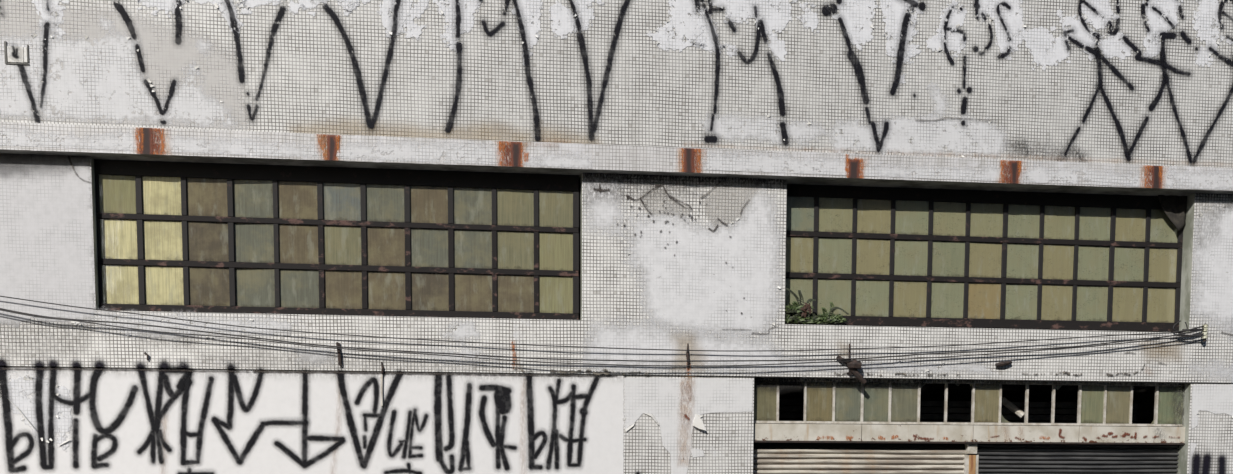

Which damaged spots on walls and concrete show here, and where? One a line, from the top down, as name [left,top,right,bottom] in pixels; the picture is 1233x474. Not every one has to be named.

peeling [645,0,1233,84]
corrosion [135,127,165,155]
corrosion [317,134,340,161]
corrosion [499,141,529,167]
corrosion [681,148,702,173]
corrosion [845,155,863,178]
corrosion [999,160,1022,184]
corrosion [1144,165,1163,188]
crack [626,183,719,215]
peeling [0,0,986,474]